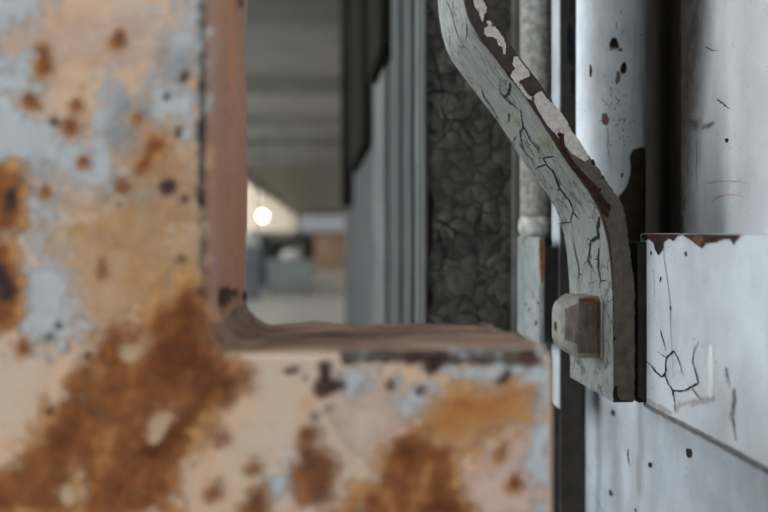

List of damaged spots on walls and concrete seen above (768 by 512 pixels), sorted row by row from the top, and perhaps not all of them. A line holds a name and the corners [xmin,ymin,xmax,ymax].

rust [0,158,50,337]
rust [112,114,195,209]
crack [429,3,606,288]
peeling [473,0,646,416]
rust [559,132,609,218]
crack [601,86,618,168]
rust [642,234,745,255]
rust [0,260,255,512]
rust [240,483,270,512]
rust [290,375,535,512]
peeling [386,348,548,489]
crack [725,368,736,439]